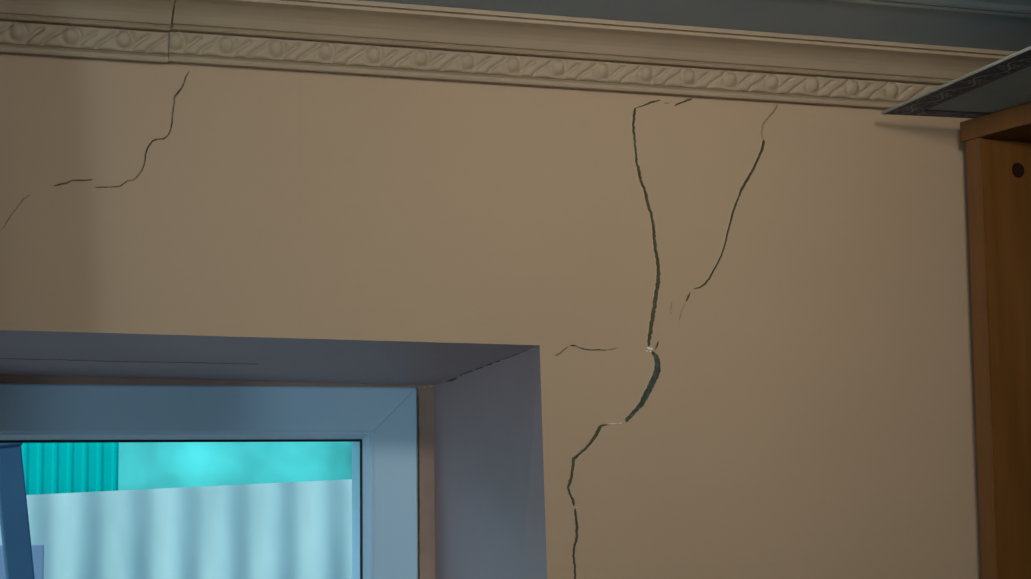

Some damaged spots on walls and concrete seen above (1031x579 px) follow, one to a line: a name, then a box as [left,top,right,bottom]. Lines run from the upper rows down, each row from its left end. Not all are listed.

crack [54,72,189,188]
crack [686,140,765,302]
crack [567,97,699,579]